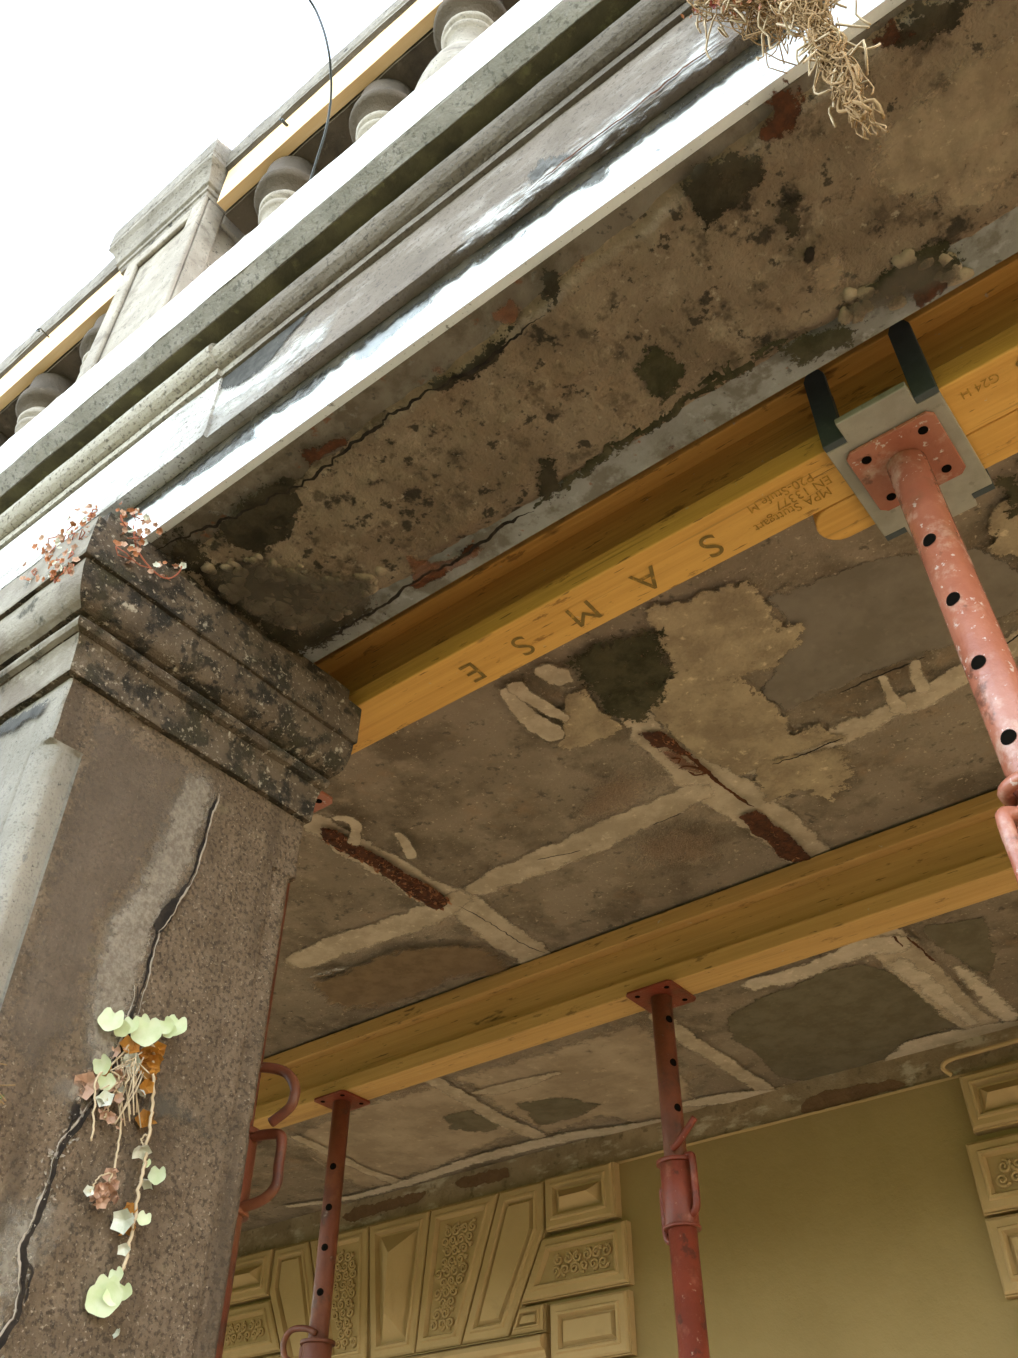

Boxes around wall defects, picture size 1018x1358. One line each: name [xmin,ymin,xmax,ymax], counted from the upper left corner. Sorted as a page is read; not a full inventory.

crack [155,315,545,551]
crack [318,511,534,645]
crack [0,793,220,1358]